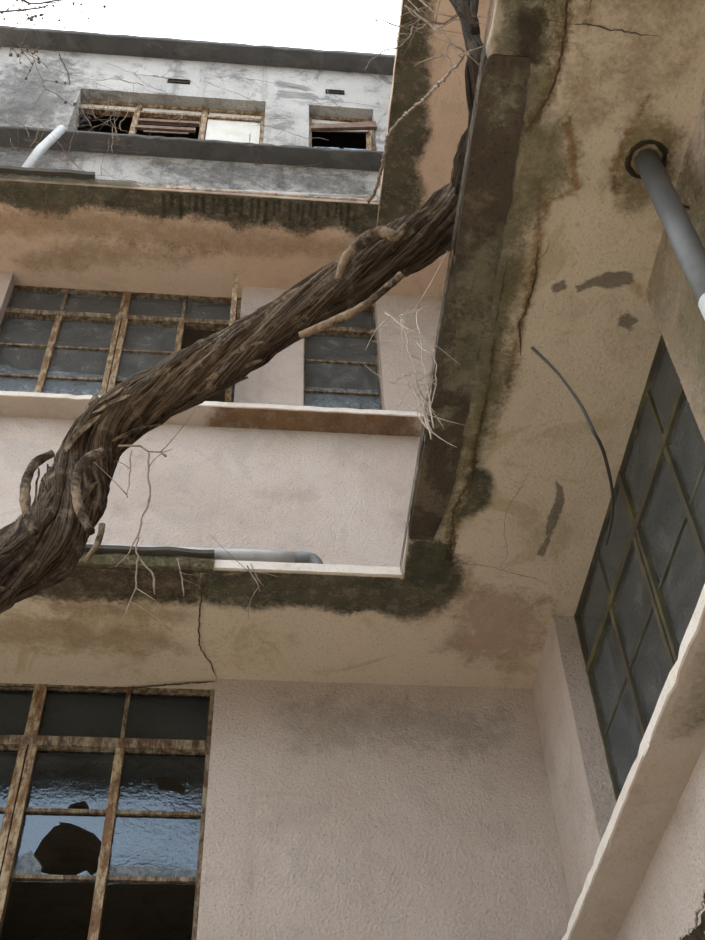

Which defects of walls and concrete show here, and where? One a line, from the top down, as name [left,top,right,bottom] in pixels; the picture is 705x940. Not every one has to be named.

water stain [0,0,433,236]
water stain [515,9,541,64]
crack [523,0,660,137]
water stain [610,114,705,248]
water stain [648,229,705,442]
crack [0,573,216,689]
water stain [32,565,204,604]